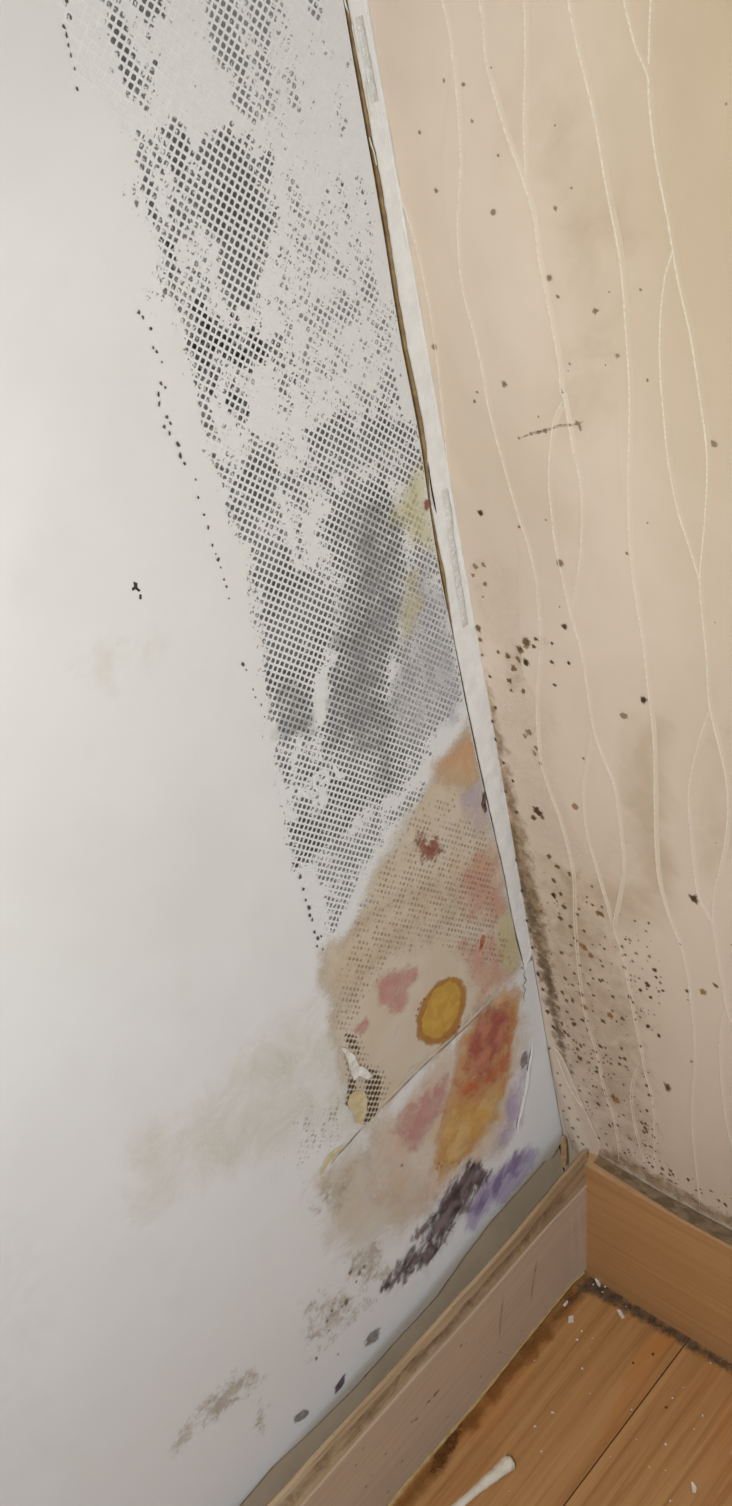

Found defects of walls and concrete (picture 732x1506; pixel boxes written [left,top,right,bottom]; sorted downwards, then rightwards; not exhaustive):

leakage [103,0,165,111]
leakage [123,0,732,1292]
peeling [341,1047,373,1124]